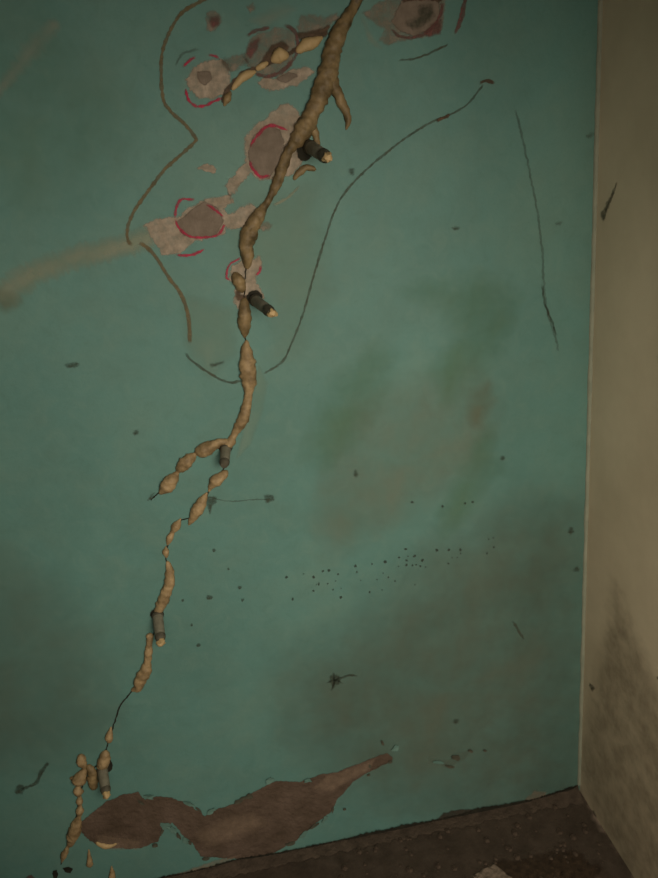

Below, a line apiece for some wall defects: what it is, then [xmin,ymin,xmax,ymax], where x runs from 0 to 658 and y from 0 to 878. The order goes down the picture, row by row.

flaking render [186,12,339,99]
crack [221,31,328,102]
flaking render [365,0,444,45]
flaking render [145,104,302,255]
crack [75,691,132,818]
peeling [81,741,399,861]